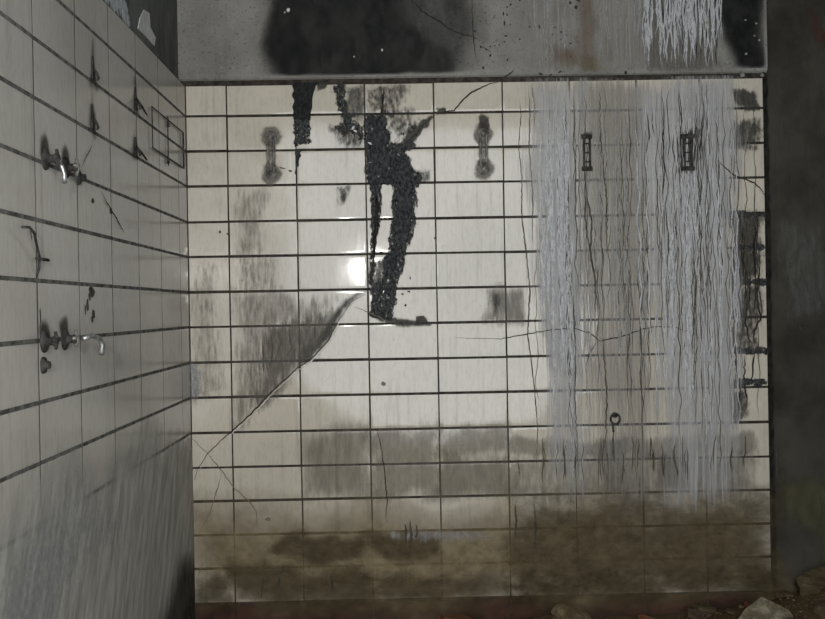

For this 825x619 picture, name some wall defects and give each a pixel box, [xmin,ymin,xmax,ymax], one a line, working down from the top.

damp [491,0,769,501]
crack [718,160,764,194]
crack [456,326,698,362]
crack [195,294,391,579]
damp [0,443,196,619]